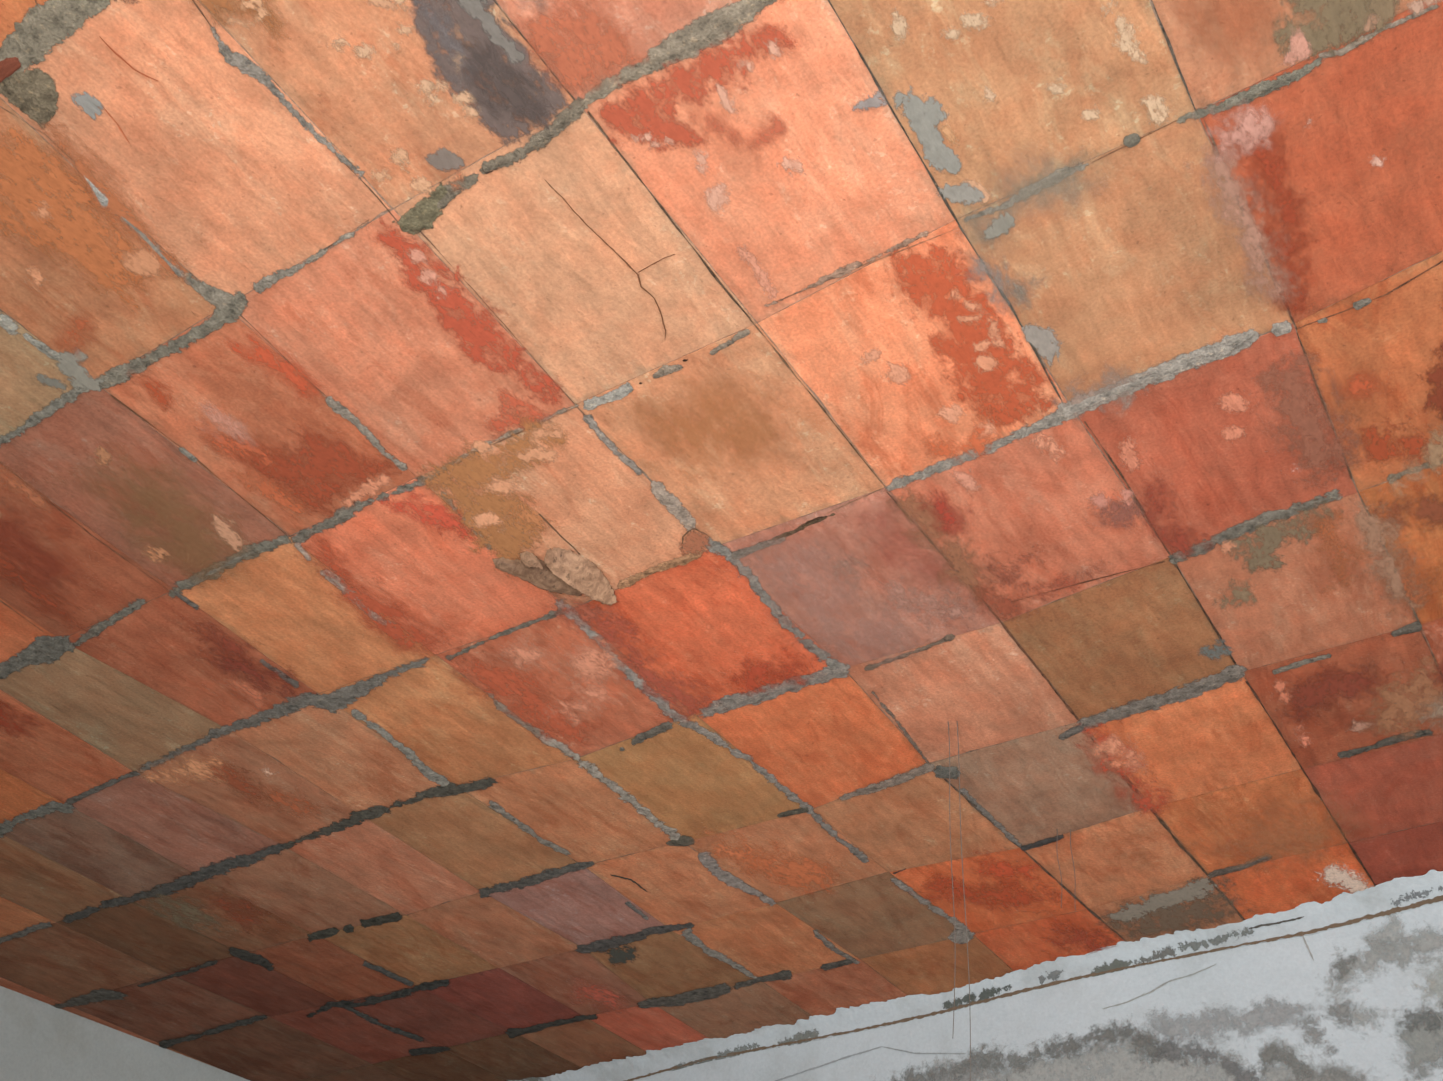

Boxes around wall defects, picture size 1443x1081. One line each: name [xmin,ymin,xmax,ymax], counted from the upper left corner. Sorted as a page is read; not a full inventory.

water stain [425,148,465,172]
water stain [393,0,636,145]
water stain [599,25,796,210]
crack [545,180,675,338]
water stain [1051,876,1249,951]
water stain [893,917,1443,1081]